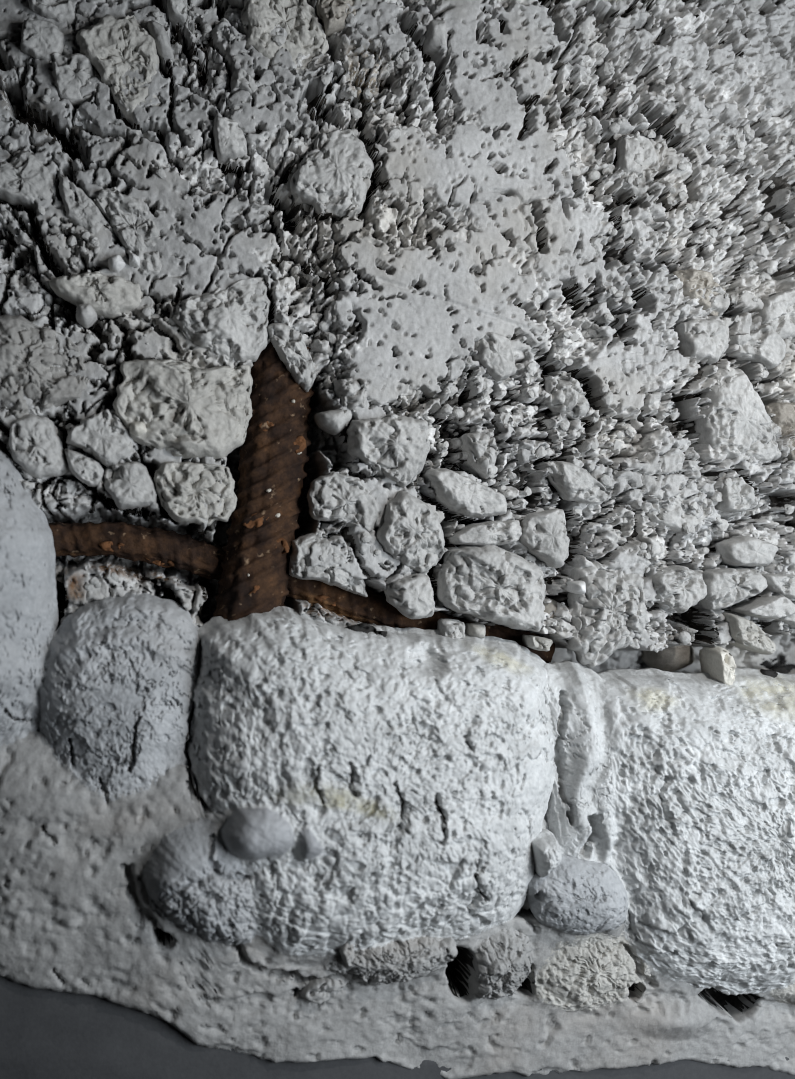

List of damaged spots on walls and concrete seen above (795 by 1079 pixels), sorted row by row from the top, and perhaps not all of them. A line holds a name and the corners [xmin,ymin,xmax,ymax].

spalling [48,342,555,663]
crack [396,785,404,828]
crack [435,798,448,841]